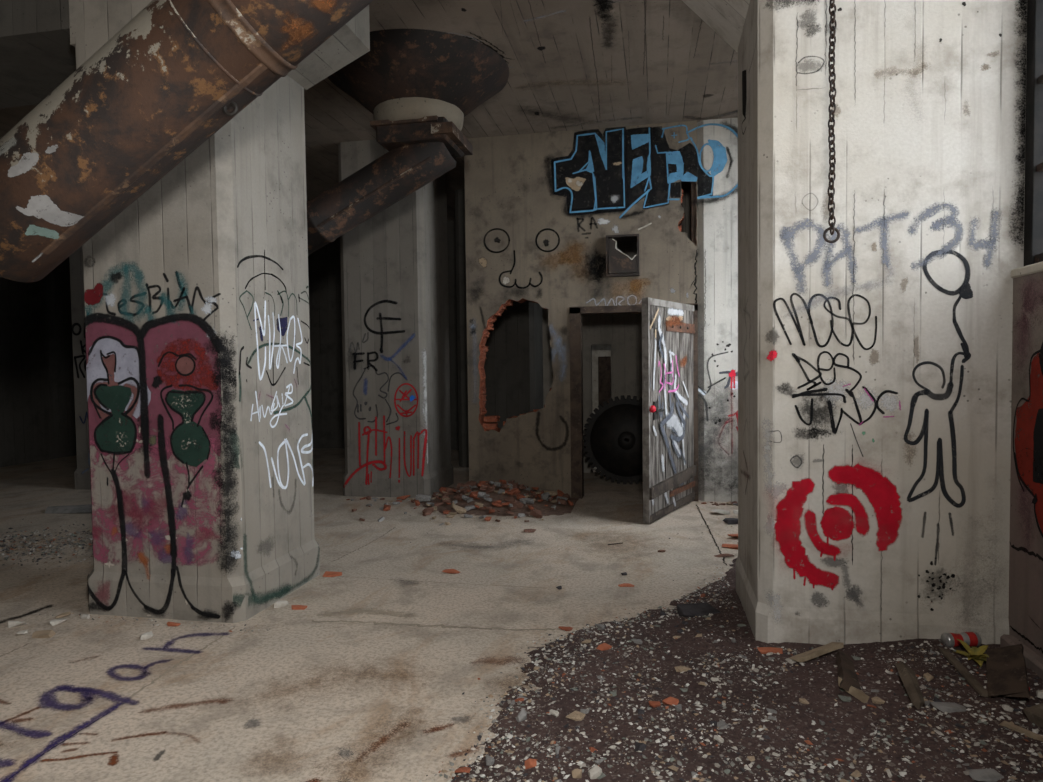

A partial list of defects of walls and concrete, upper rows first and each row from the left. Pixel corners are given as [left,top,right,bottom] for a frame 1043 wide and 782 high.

water stain [594,0,616,47]
crack [792,13,800,91]
crack [822,0,830,74]
peeling [0,137,58,177]
peeling [16,195,84,239]
spalling [479,300,545,431]